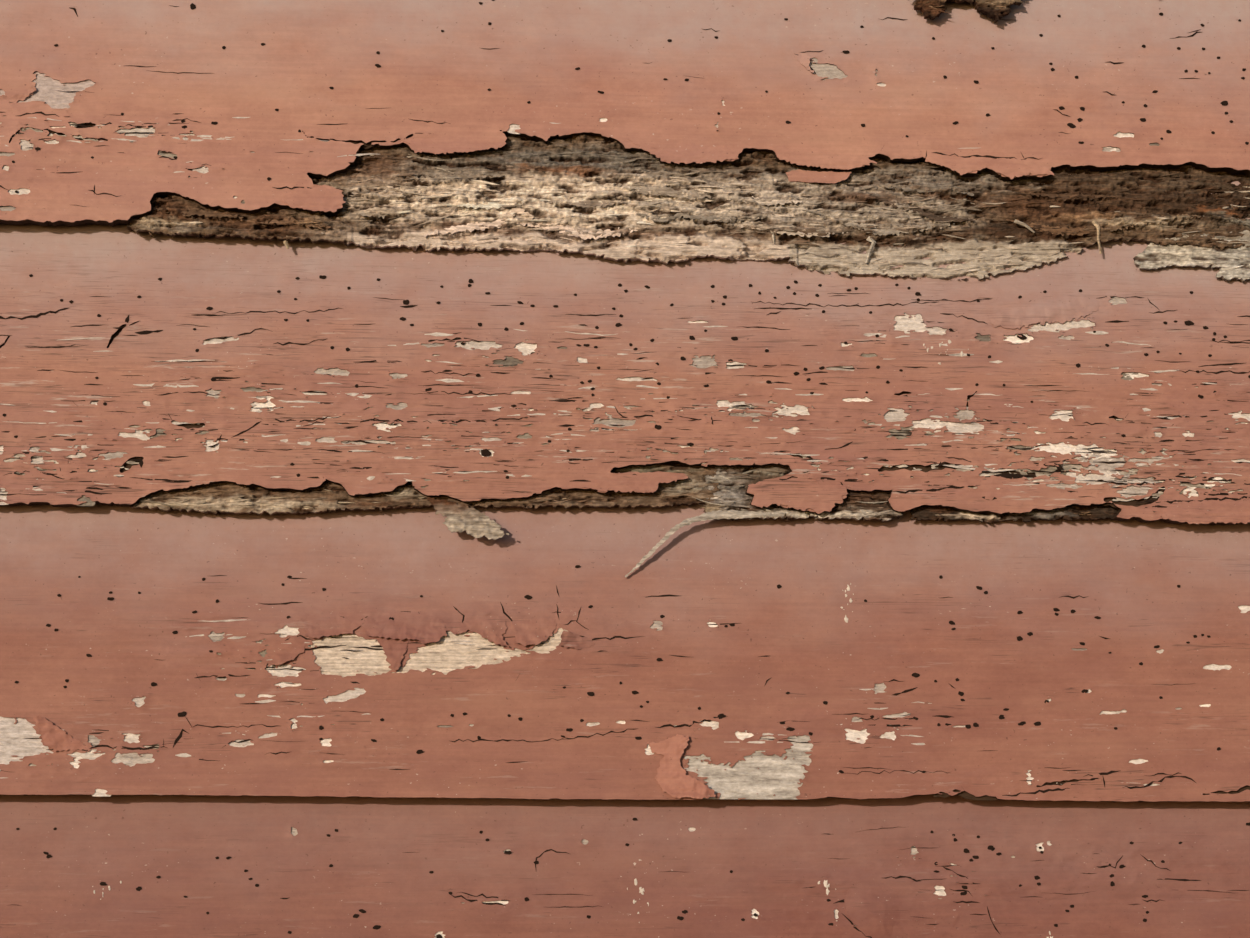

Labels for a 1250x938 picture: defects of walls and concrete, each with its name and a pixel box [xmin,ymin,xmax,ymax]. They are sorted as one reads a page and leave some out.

peeling [0,72,195,171]
peeling [404,124,521,155]
peeling [773,145,877,184]
peeling [917,149,1054,180]
peeling [283,187,346,213]
peeling [675,398,815,435]
peeling [842,397,991,440]
peeling [583,437,742,493]
peeling [421,478,509,540]
peeling [235,609,594,704]
peeling [0,716,159,771]
peeling [645,725,813,800]